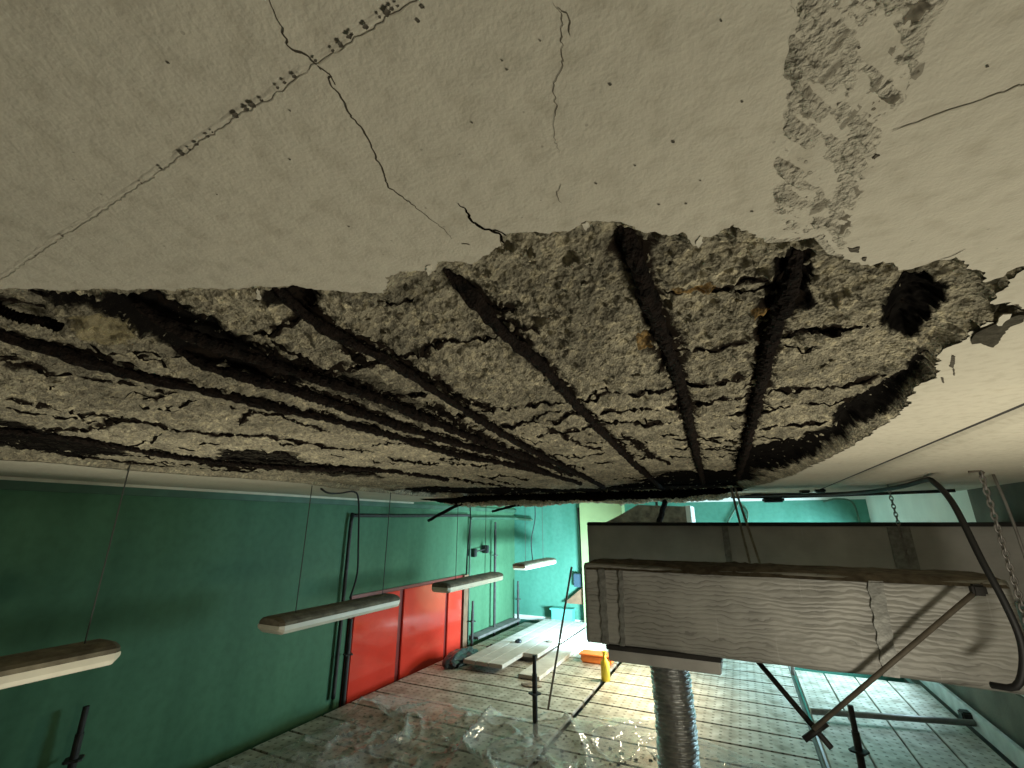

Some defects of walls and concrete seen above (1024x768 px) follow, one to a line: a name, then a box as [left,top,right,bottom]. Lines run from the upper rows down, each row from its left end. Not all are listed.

crack [269,0,506,245]
crack [553,5,571,152]
spalling [869,94,900,117]
spalling [904,1,936,25]
spalling [0,214,1024,522]